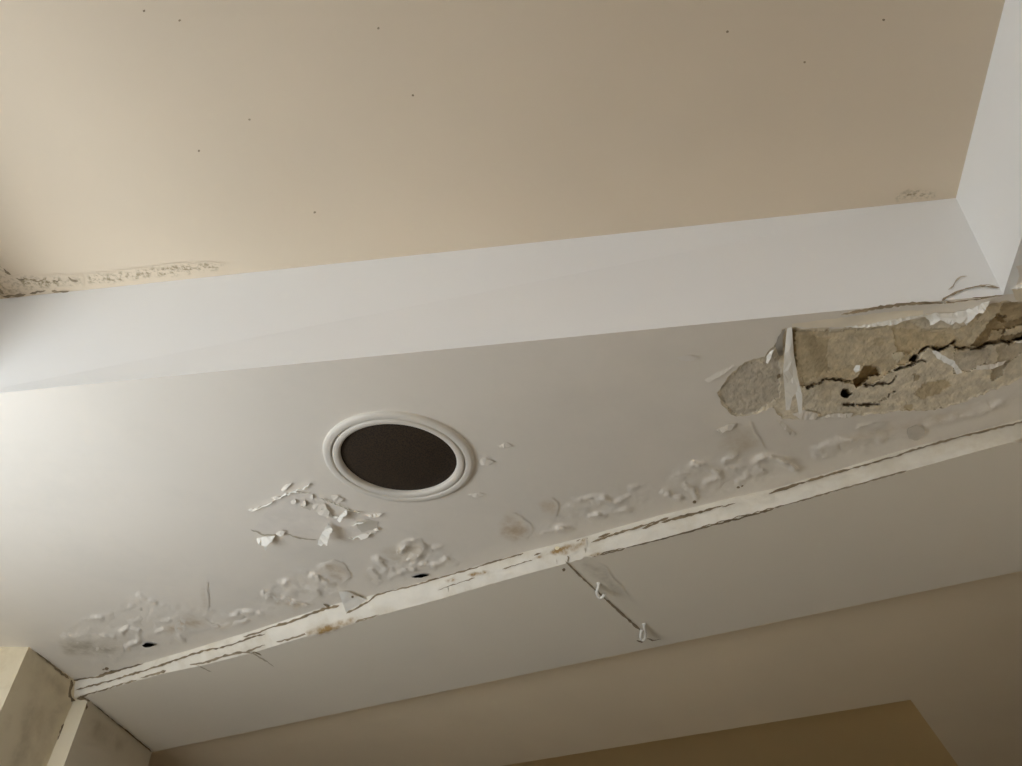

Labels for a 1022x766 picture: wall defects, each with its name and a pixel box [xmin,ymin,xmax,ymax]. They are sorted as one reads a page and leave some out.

leakage [0,258,225,298]
flaking render [704,265,1022,437]
crack [841,276,1002,315]
crack [37,421,1022,751]